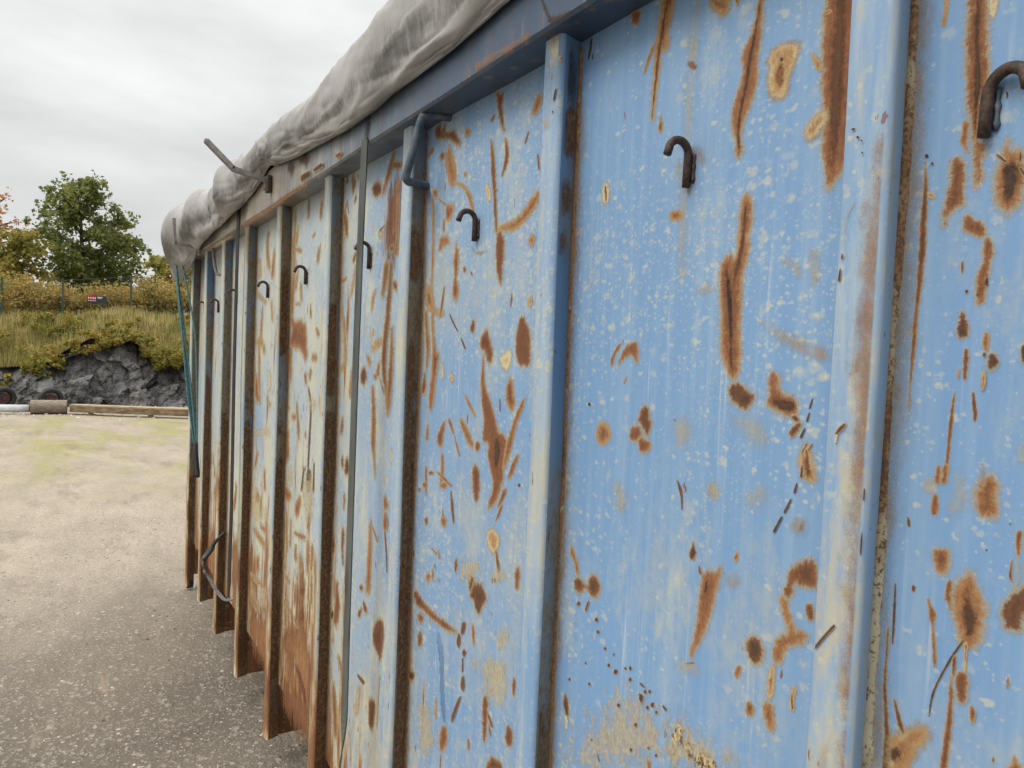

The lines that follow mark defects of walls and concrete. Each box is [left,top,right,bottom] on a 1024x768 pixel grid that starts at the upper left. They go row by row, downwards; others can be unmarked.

corrosion [730,0,852,190]
corrosion [907,0,1024,408]
corrosion [610,341,639,367]
corrosion [718,192,817,483]
corrosion [827,182,881,522]
corrosion [195,151,532,768]
corrosion [973,474,1001,520]
corrosion [689,541,734,658]
corrosion [734,557,818,732]
corrosion [842,580,855,696]
corrosion [882,628,930,768]
corrosion [932,530,1024,768]